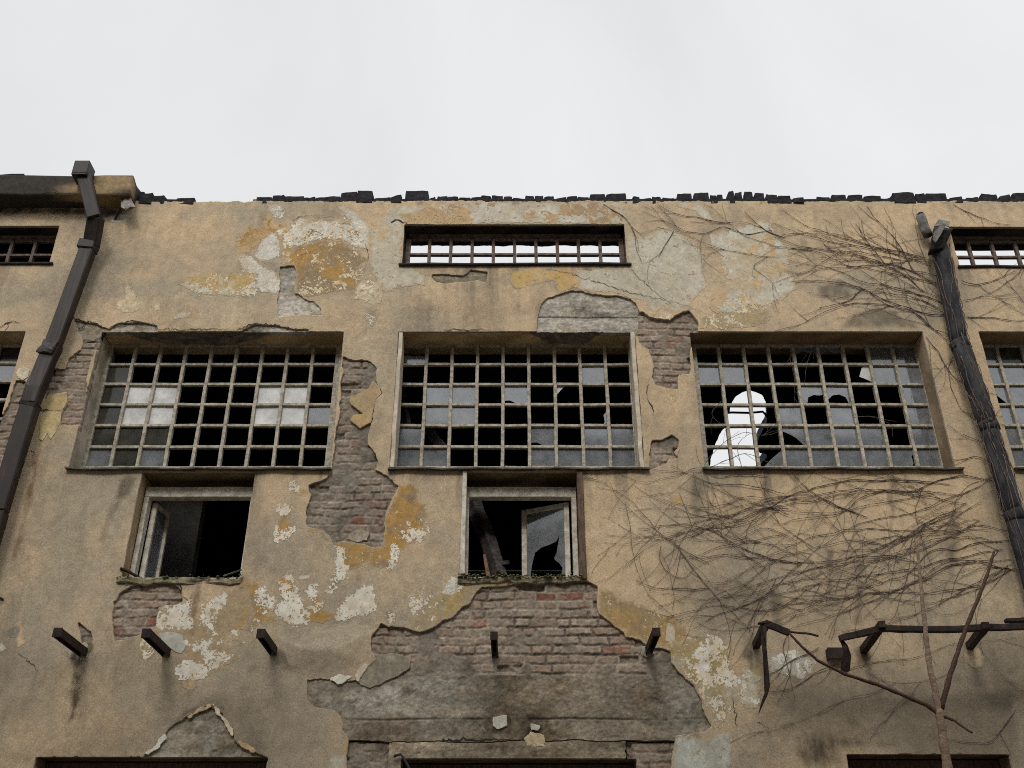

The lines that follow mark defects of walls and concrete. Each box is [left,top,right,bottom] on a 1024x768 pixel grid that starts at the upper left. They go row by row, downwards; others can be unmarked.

peeling [46,202,798,432]
spalling [113,358,817,768]